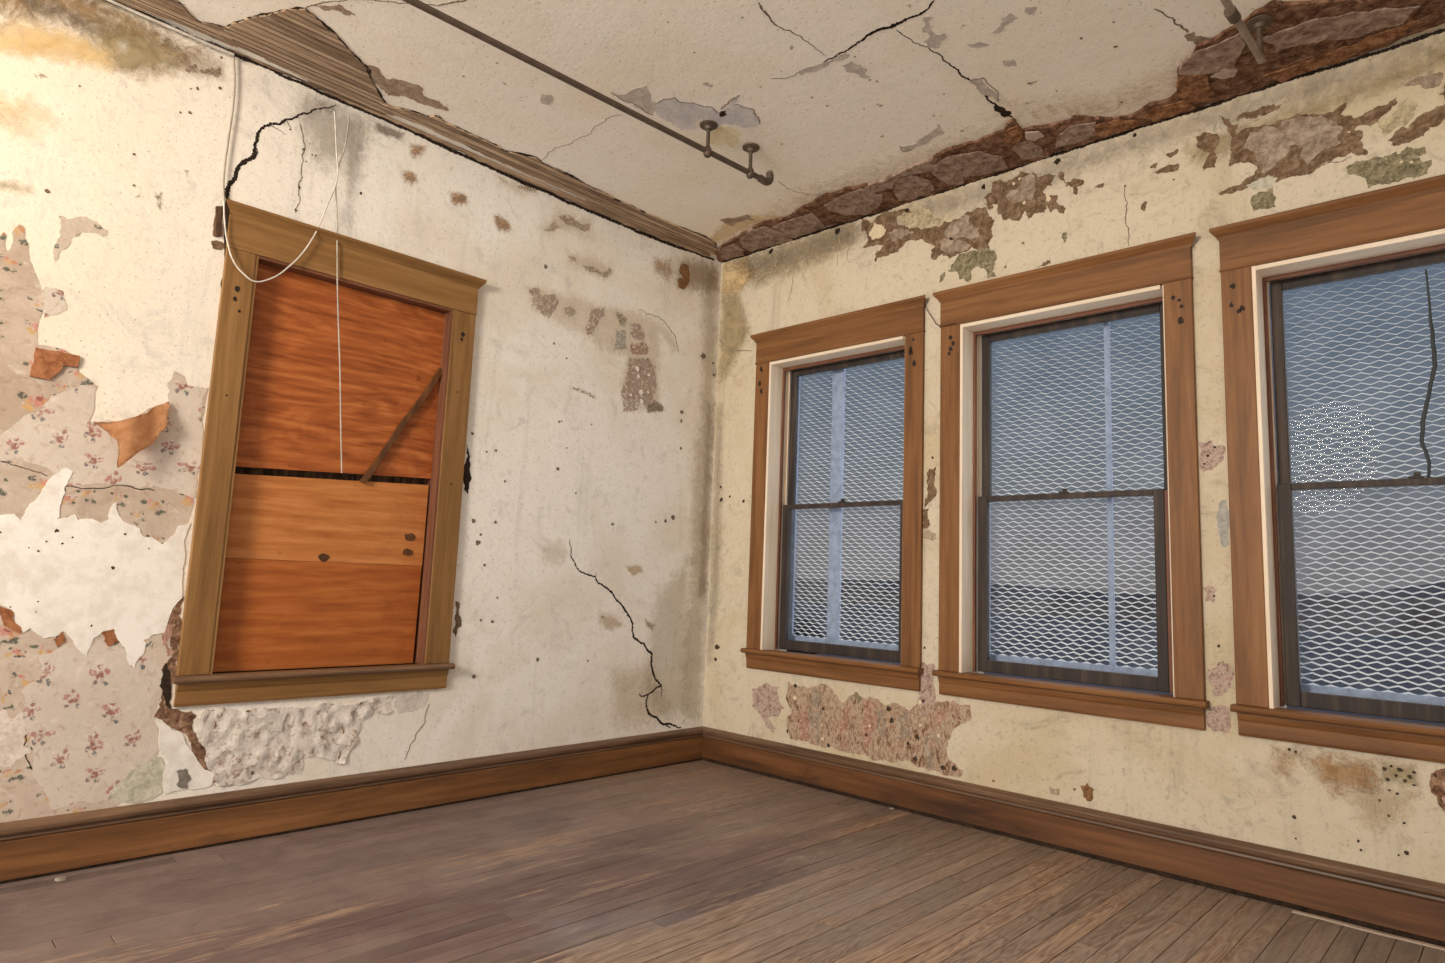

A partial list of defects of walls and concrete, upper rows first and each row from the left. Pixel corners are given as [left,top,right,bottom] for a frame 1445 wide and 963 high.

crack [225,105,336,213]
peeling [364,64,449,111]
peeling [611,85,760,148]
crack [759,0,1013,118]
peeling [1150,72,1445,210]
spalling [211,195,230,259]
peeling [861,171,1104,283]
flaking render [529,287,679,413]
flaking render [0,468,214,804]
crack [569,541,681,729]
flaking render [752,683,784,733]
flaking render [1429,768,1445,812]